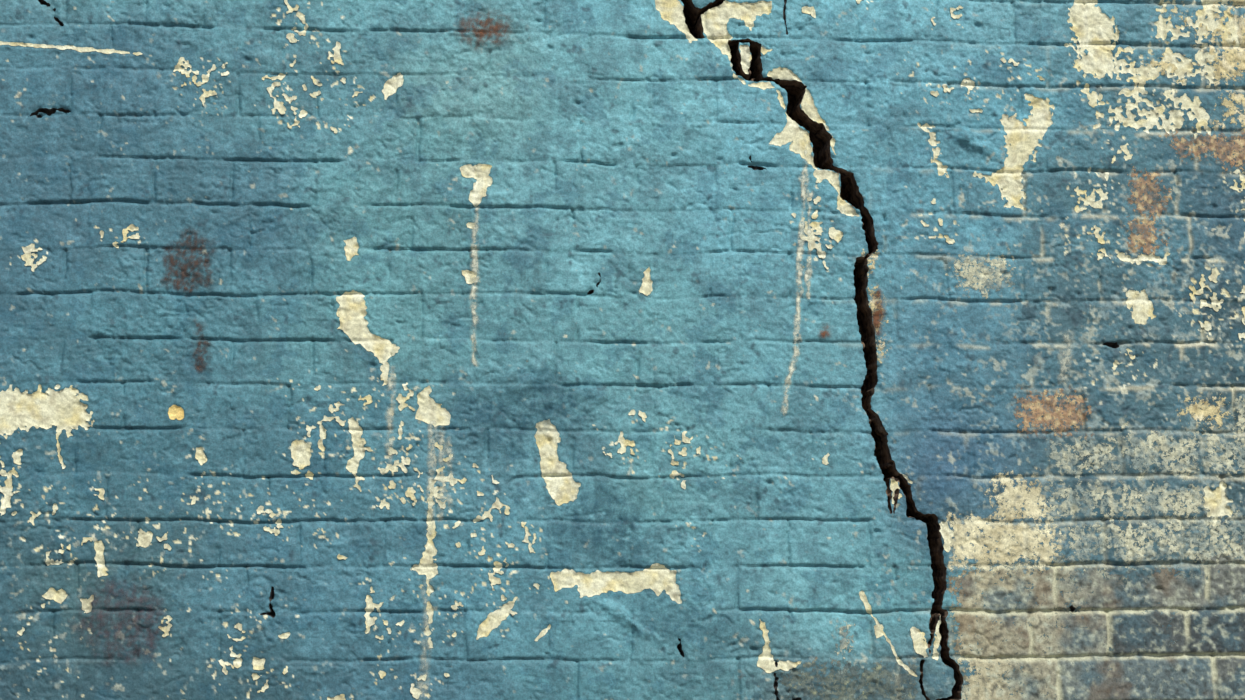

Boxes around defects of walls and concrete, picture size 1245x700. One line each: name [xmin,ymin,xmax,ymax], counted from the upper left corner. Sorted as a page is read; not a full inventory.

peeling [1064,0,1245,192]
peeling [1074,143,1172,265]
peeling [336,290,400,386]
crack [681,0,964,700]
peeling [1126,289,1156,325]
peeling [0,449,23,516]
peeling [0,384,95,469]
peeling [534,419,581,506]
peeling [42,587,94,613]
peeling [94,541,108,577]
peeling [550,563,682,604]
flaking render [757,385,1245,700]